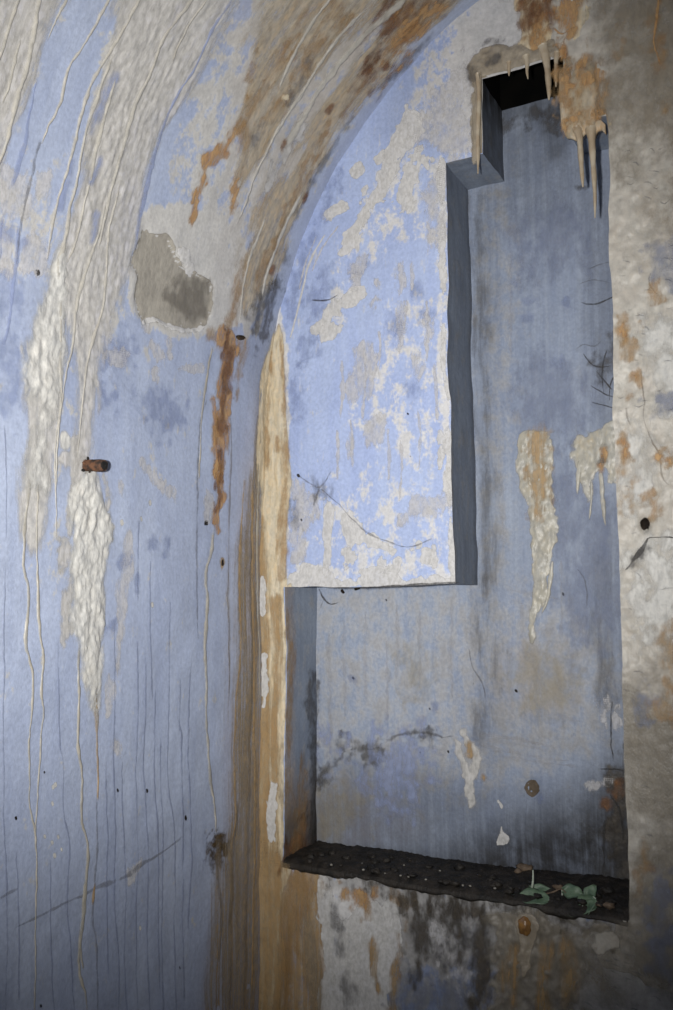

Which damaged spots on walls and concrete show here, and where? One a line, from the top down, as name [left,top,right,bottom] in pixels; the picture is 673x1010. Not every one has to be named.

spalling [131,229,213,382]
rust [189,0,457,535]
peeling [287,427,455,587]
peeling [310,59,483,352]
peeling [411,312,451,400]
damp [467,0,673,995]
damp [207,429,532,1010]